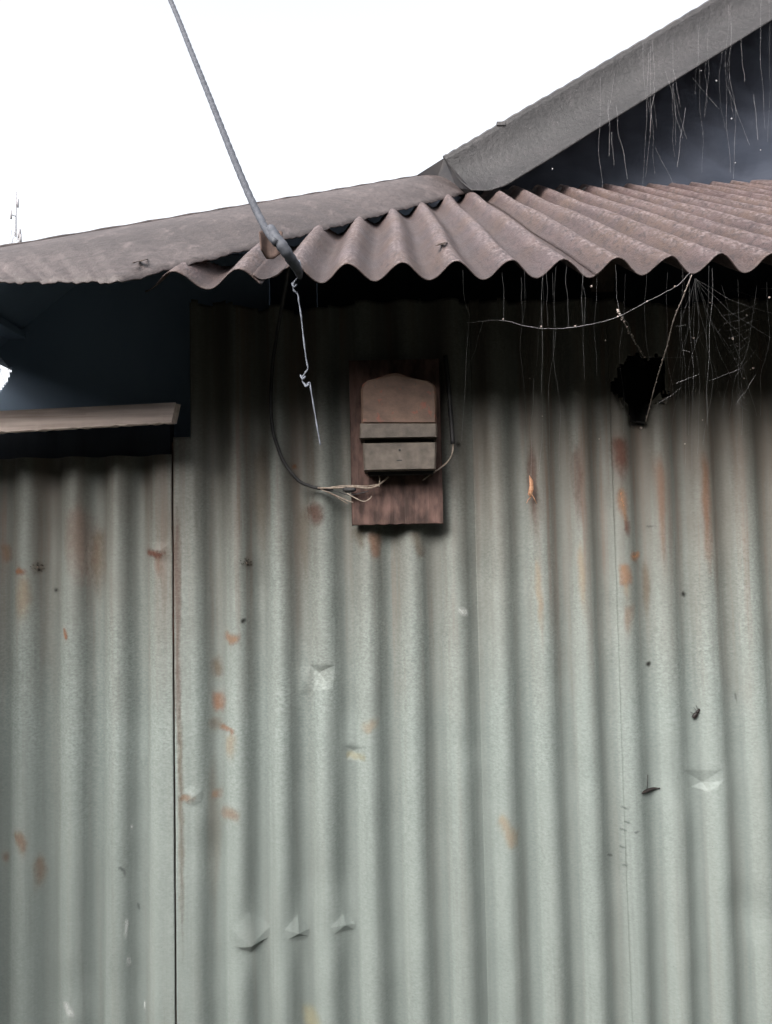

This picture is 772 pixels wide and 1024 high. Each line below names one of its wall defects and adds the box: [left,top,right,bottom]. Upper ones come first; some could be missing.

spalling [611,355,669,424]